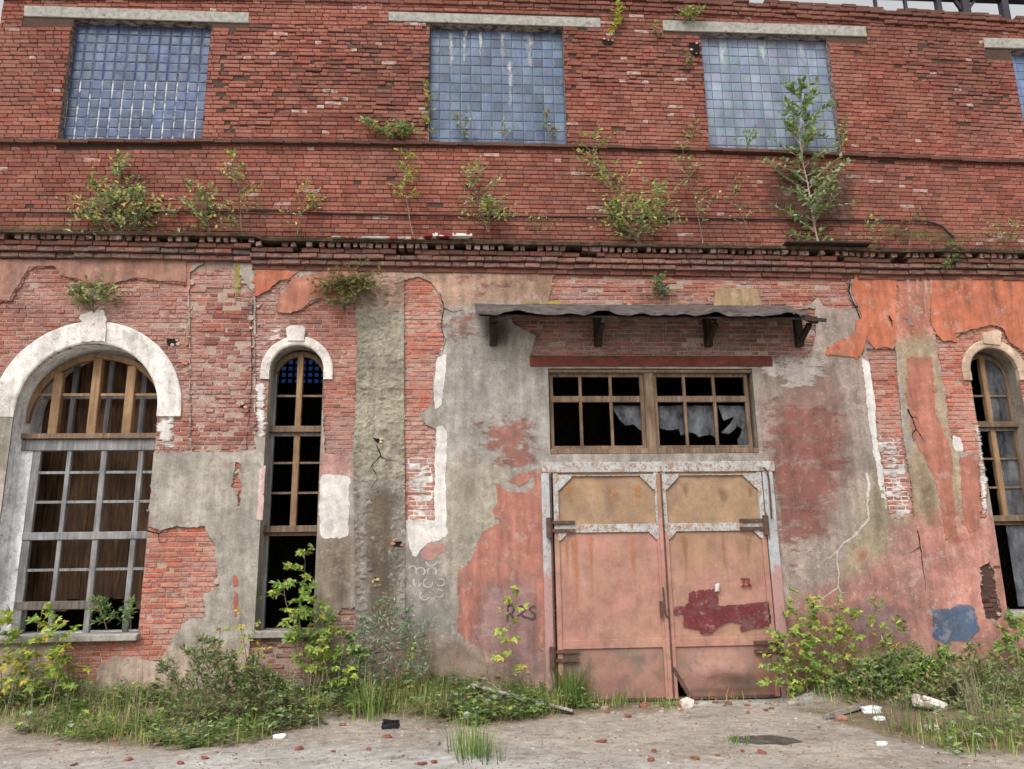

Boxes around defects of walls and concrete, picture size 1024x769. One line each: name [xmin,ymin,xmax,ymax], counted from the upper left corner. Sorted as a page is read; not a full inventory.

peeling [0,259,361,506]
spalling [404,278,480,524]
spalling [512,273,1024,544]
spalling [54,485,238,681]
peeling [421,542,445,561]
peeling [454,419,552,652]
crack [806,473,871,603]
spalling [980,563,1002,622]